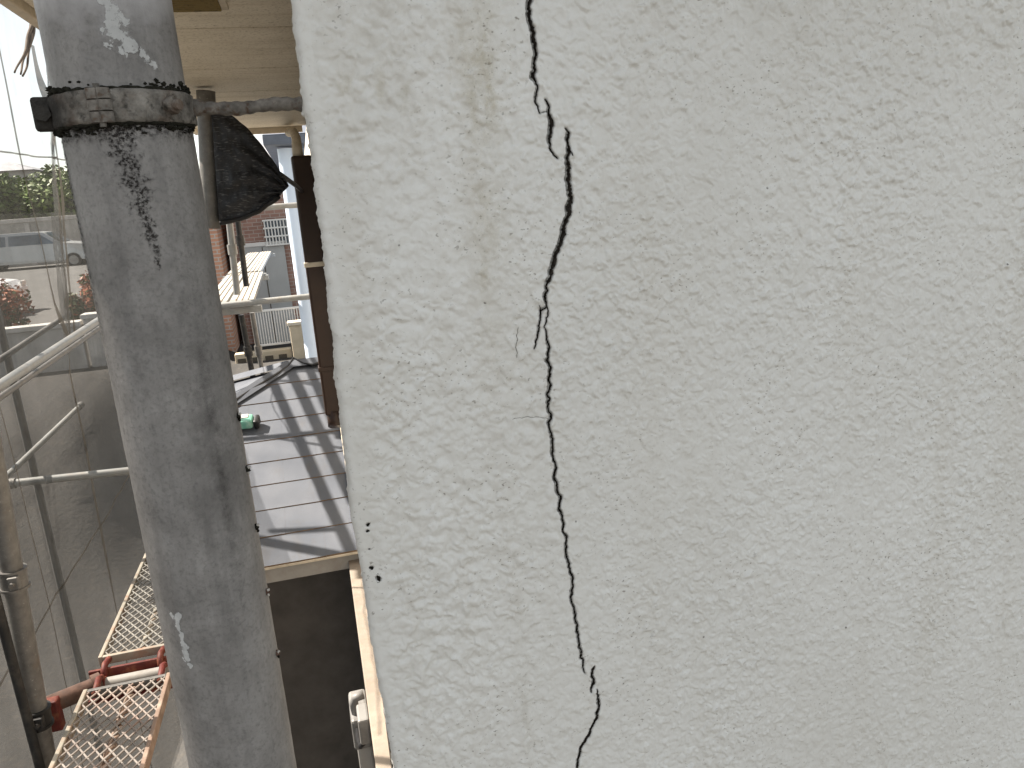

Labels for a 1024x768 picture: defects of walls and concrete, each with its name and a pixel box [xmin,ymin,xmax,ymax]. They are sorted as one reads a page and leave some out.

peeling [97,0,158,69]
mould [61,124,193,334]
crack [512,0,600,768]
peeling [169,612,193,669]